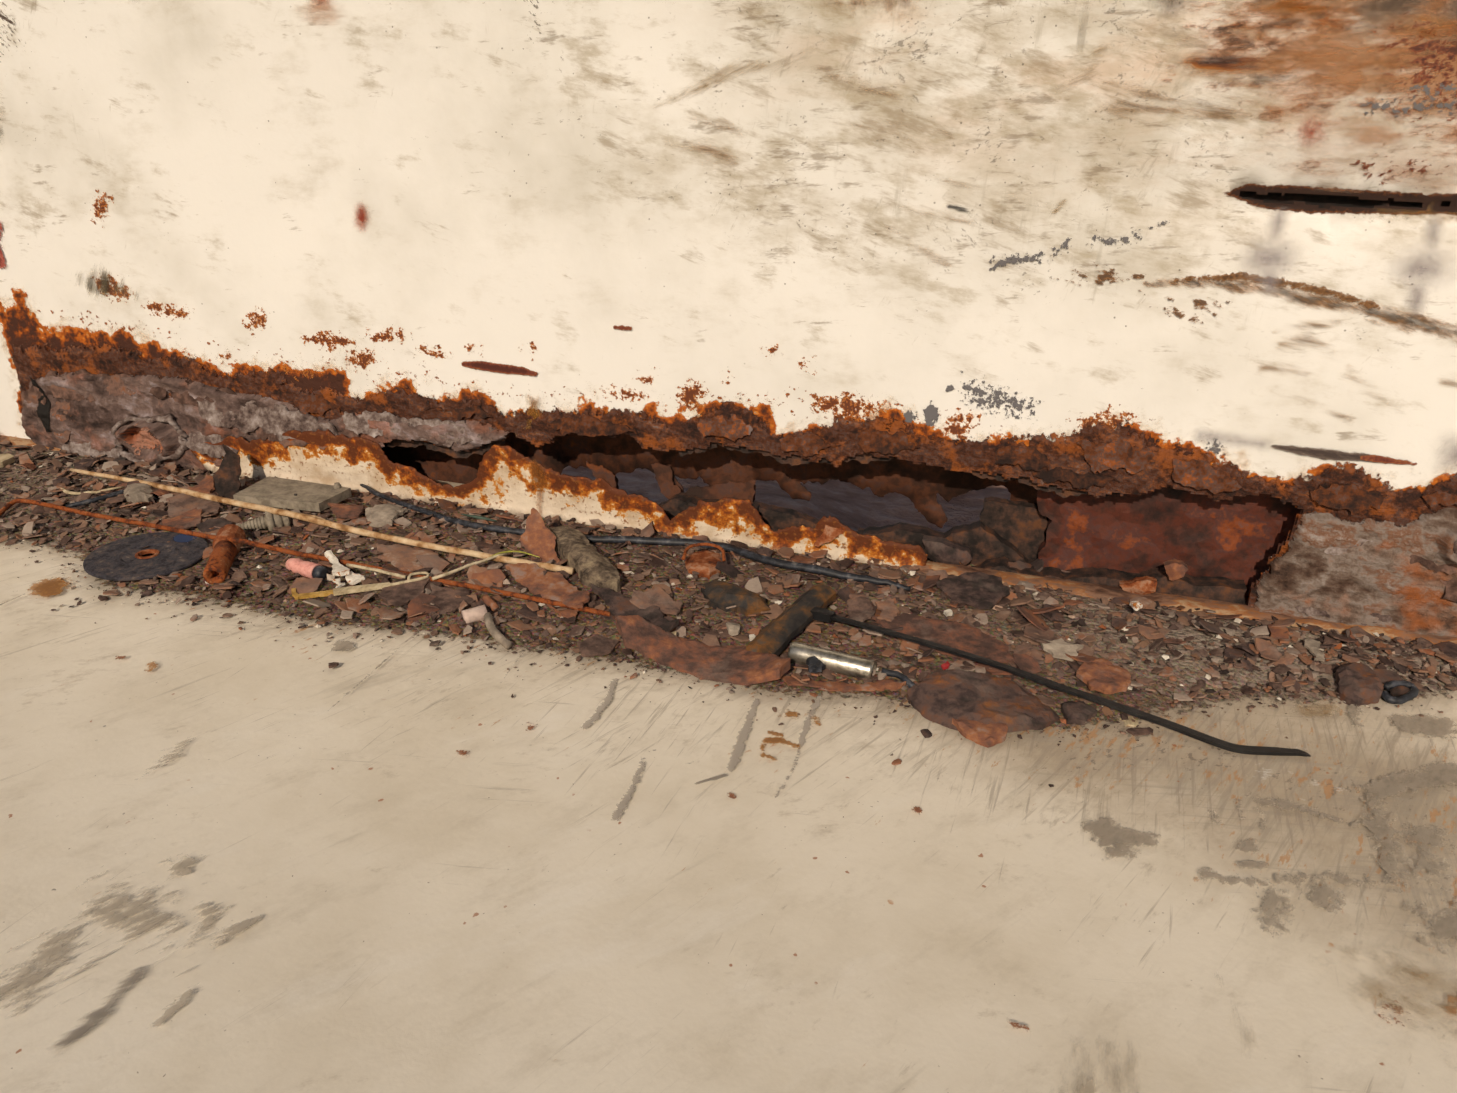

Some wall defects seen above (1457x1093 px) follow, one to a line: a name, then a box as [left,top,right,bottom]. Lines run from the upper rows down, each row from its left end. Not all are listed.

rust [1185,0,1457,197]
rust [90,190,114,228]
rust [1051,265,1145,295]
peeling [904,371,1041,426]
rust [0,272,1457,637]
rust [577,635,619,657]